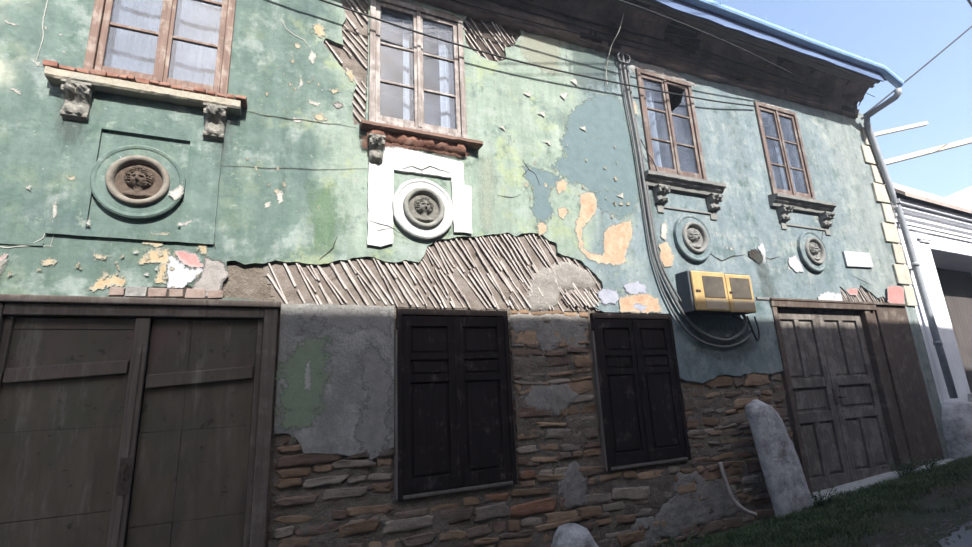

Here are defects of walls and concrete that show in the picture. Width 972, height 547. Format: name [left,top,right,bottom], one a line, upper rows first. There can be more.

peeling [518,78,641,266]
peeling [0,253,12,277]
flaking render [88,232,230,299]
peeling [273,303,394,460]